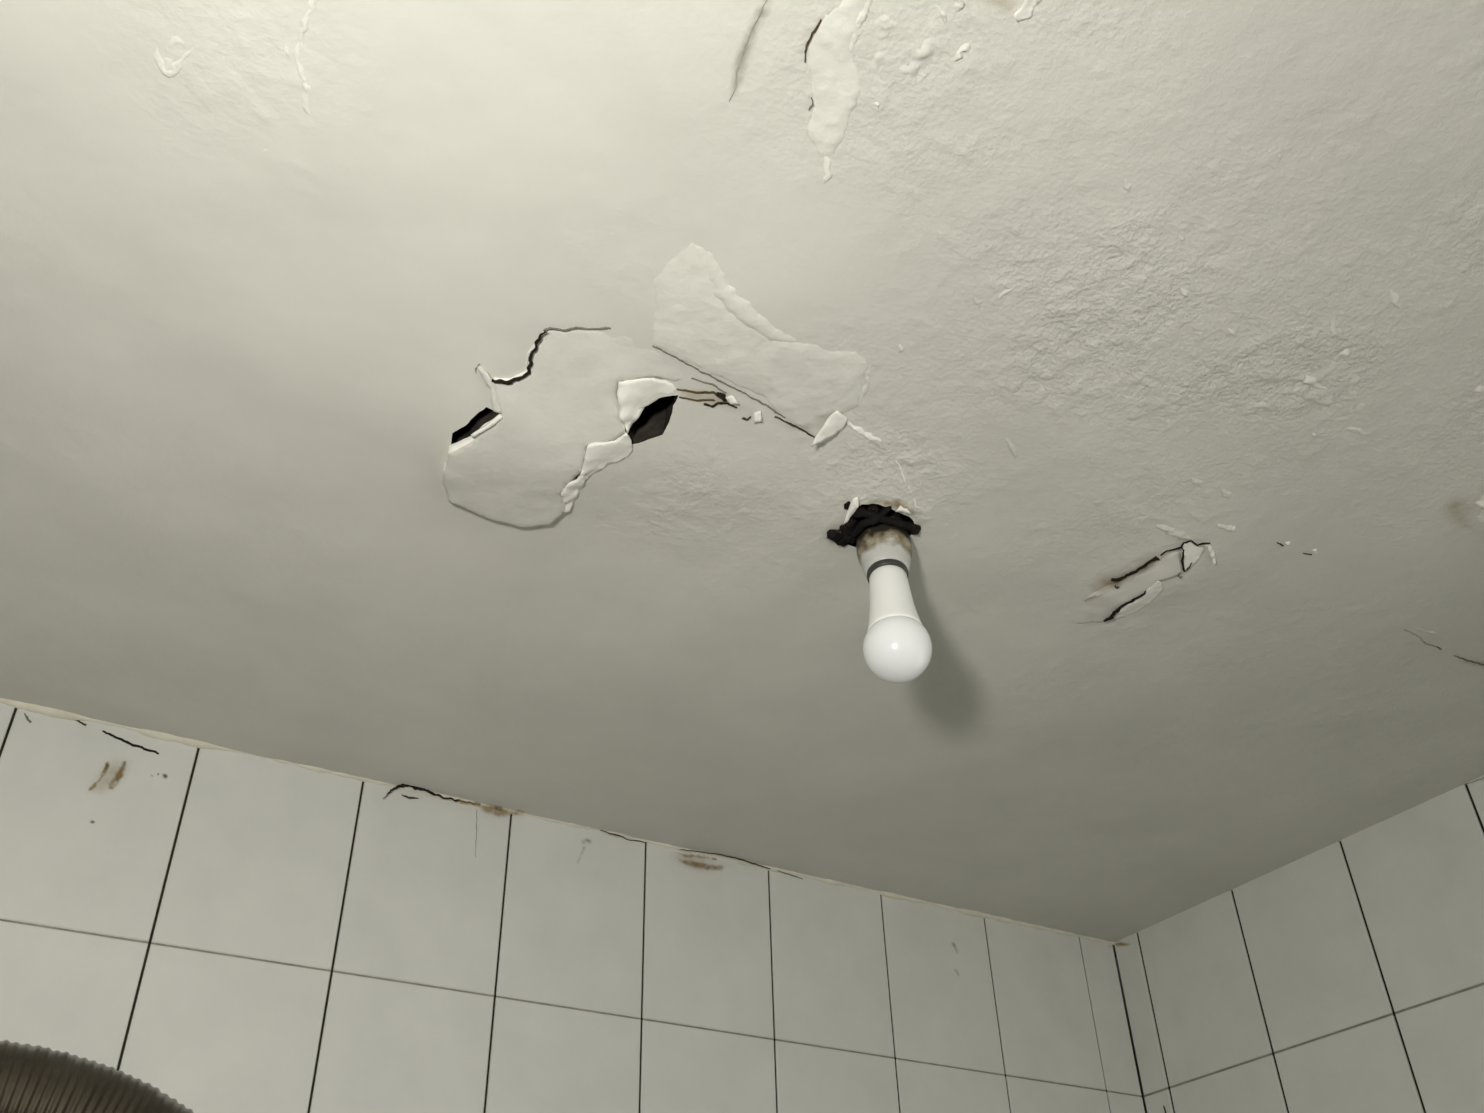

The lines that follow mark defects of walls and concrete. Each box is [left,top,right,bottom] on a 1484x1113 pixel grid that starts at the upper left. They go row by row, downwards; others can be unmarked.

crack [729,0,767,102]
flaking render [804,0,873,183]
flaking render [1014,0,1041,22]
flaking render [443,326,683,528]
spalling [1071,524,1237,624]
crack [1404,628,1484,666]